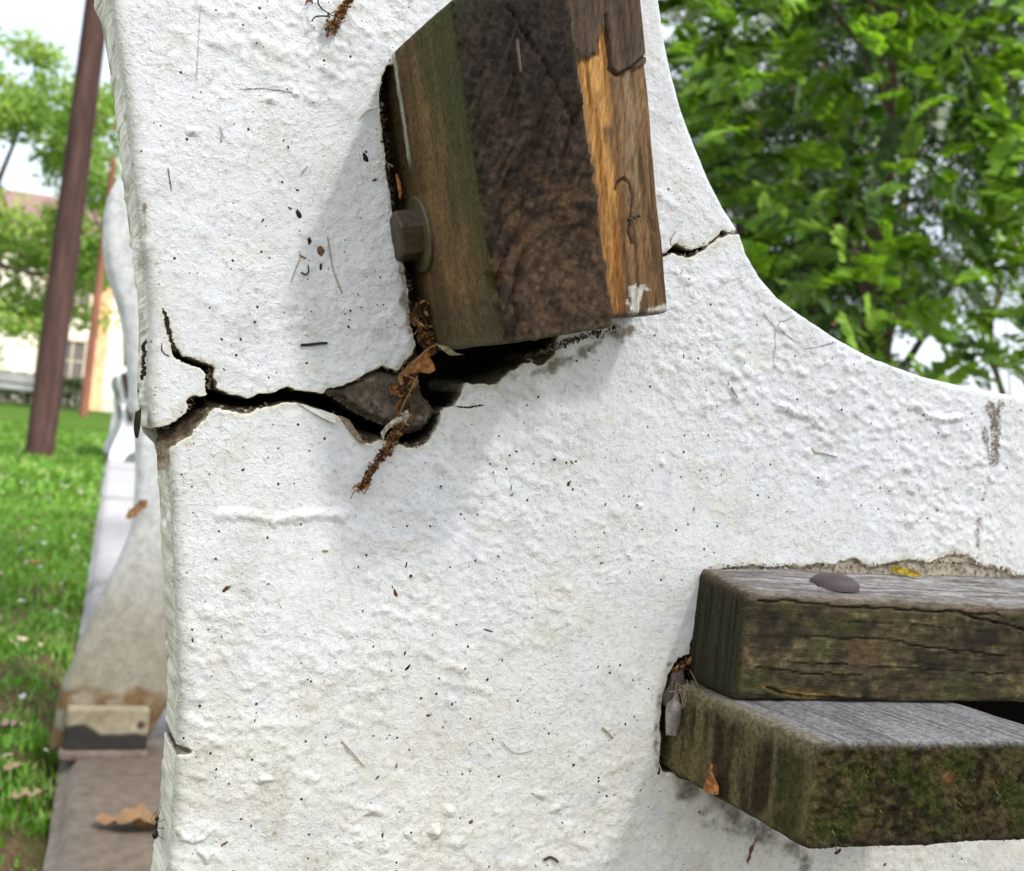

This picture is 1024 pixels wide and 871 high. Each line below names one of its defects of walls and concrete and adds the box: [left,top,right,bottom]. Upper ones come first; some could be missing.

crack [662,230,732,258]
crack [140,308,483,471]
spalling [724,551,1024,578]